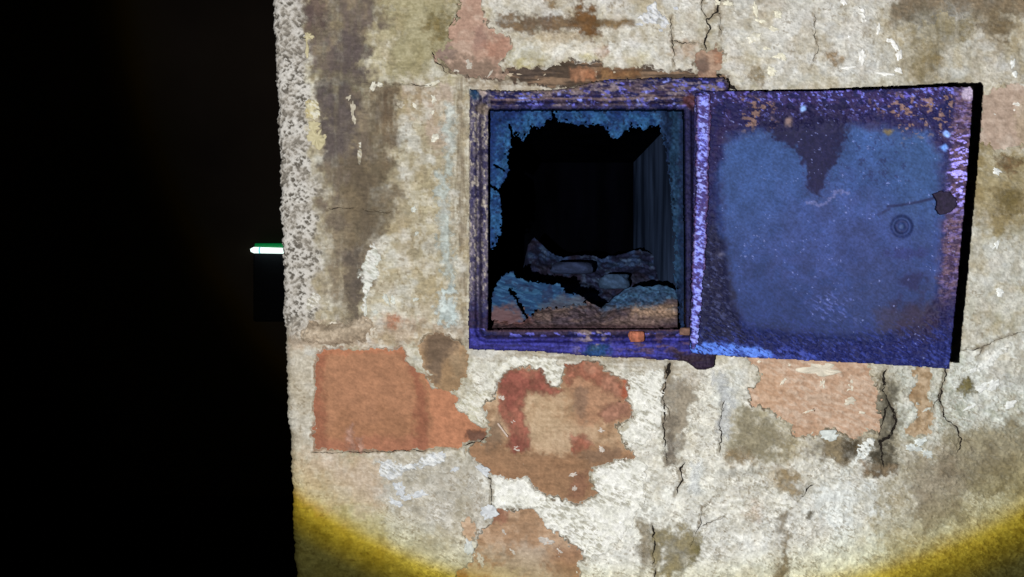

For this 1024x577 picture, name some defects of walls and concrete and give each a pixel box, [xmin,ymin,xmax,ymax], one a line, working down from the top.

spalling [432,0,727,88]
crack [670,0,722,64]
damp [303,0,453,321]
spalling [311,332,667,577]
crack [662,363,685,493]
spalling [748,358,883,464]
crack [878,369,898,467]
crack [933,332,1020,452]